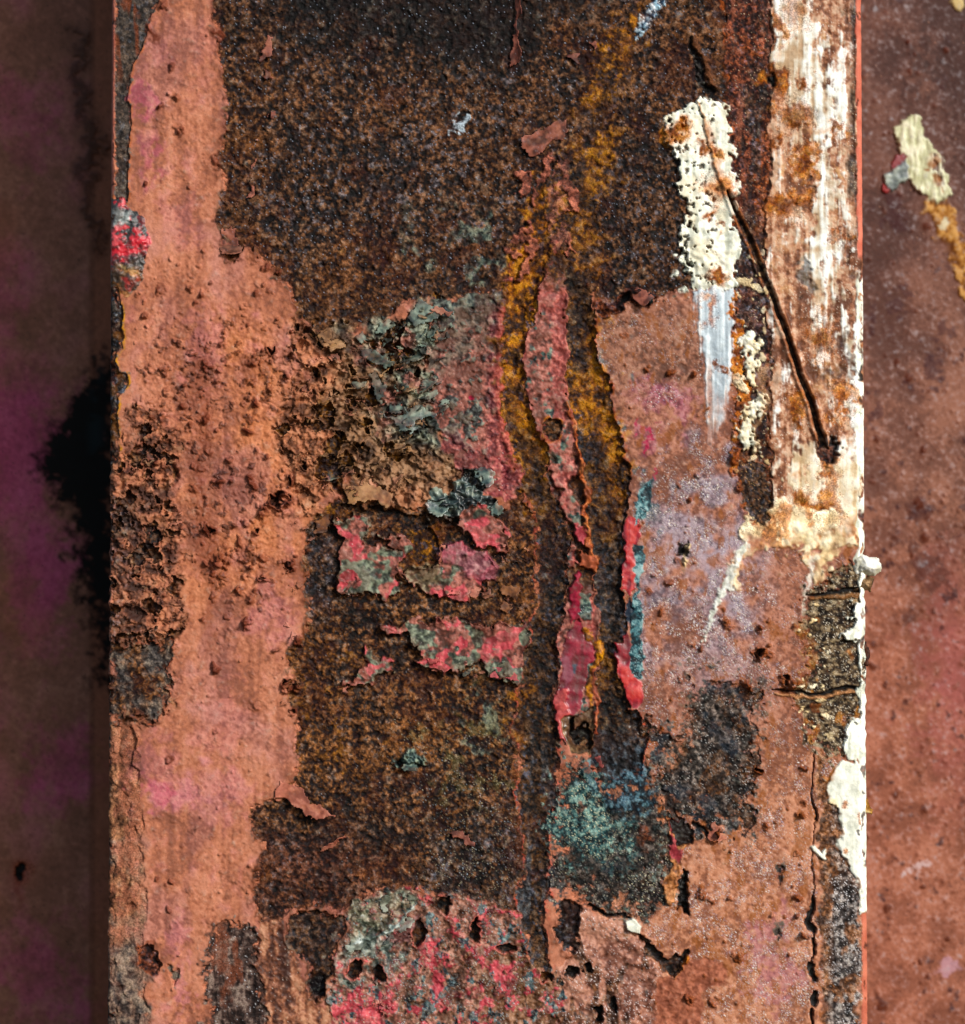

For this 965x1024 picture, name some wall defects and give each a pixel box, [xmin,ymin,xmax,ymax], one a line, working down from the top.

corrosion [209,0,965,543]
corrosion [222,489,540,925]
peeling [285,256,767,1024]
crack [804,751,819,1024]
crack [771,685,865,697]
spalling [792,560,867,1024]